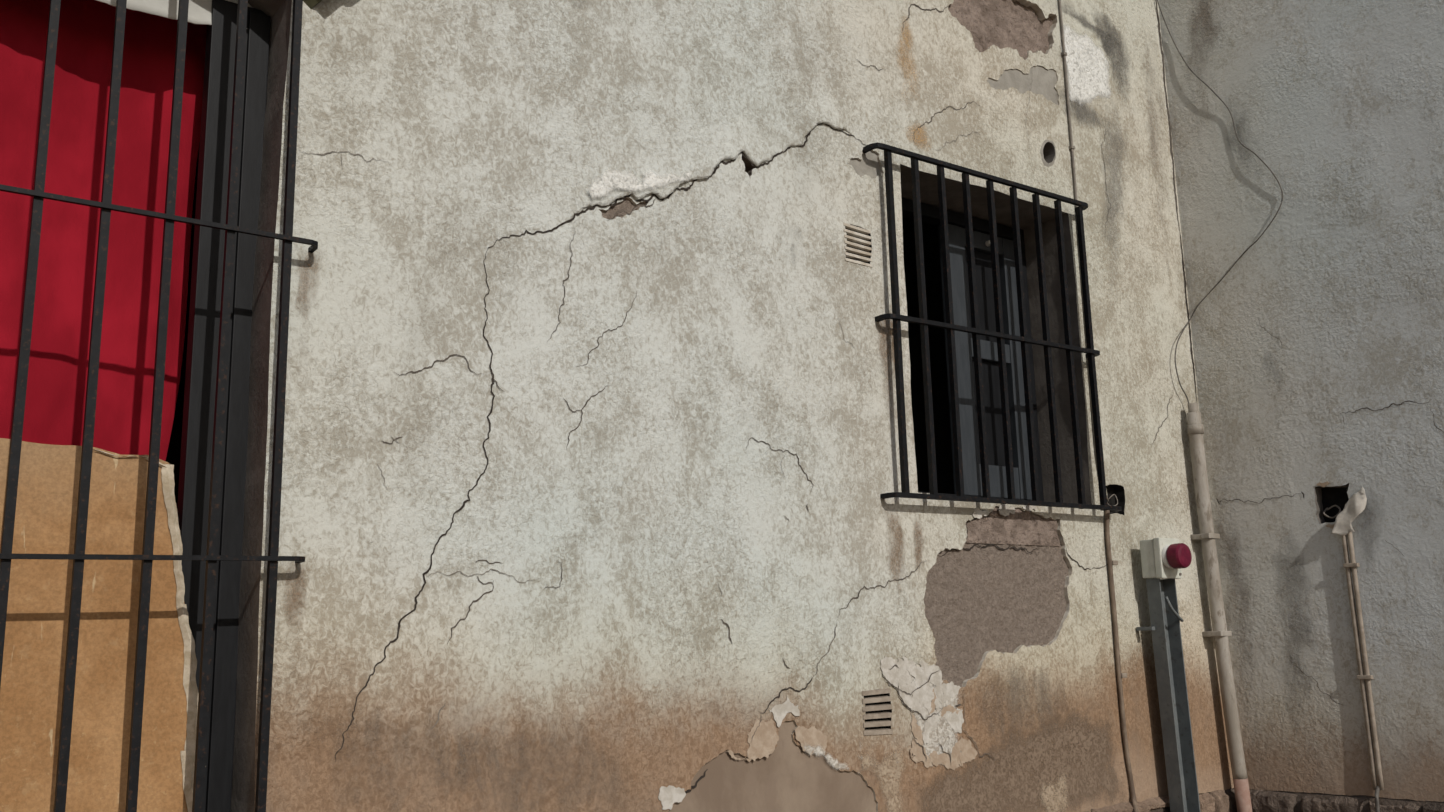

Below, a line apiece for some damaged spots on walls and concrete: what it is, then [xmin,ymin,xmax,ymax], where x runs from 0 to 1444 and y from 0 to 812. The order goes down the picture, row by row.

flaking render [903,0,1111,105]
crack [335,123,865,762]
crack [1217,491,1304,504]
crack [1340,400,1443,432]
crack [751,561,923,742]
flaking render [658,504,1118,812]